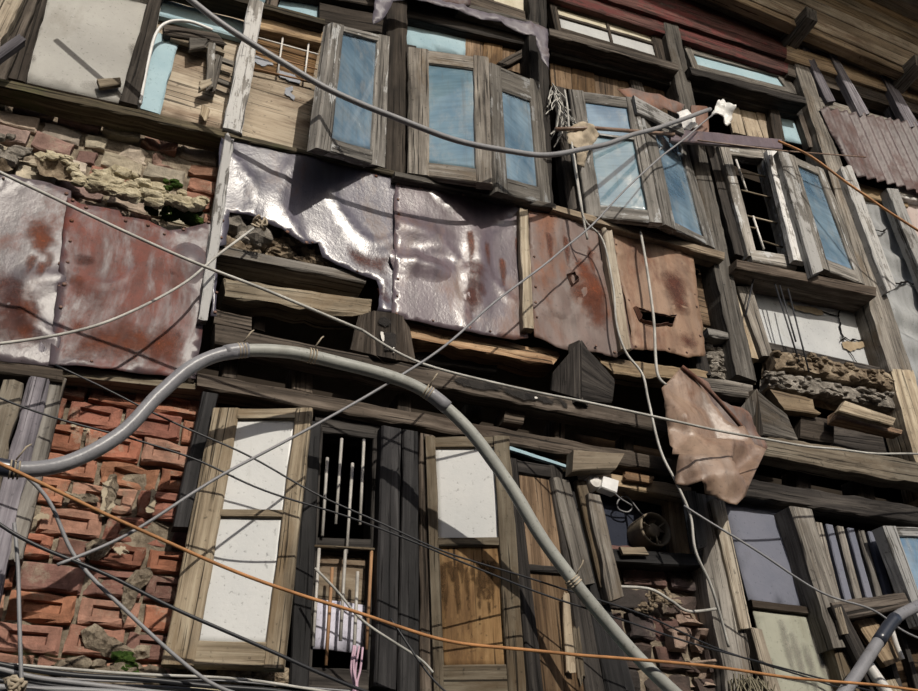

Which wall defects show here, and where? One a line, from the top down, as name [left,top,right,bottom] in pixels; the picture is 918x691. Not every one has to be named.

spalling [0,133,210,212]
corrosion [0,278,34,340]
corrosion [28,224,53,273]
corrosion [82,326,178,361]
corrosion [466,231,483,306]
corrosion [564,237,605,324]
corrosion [667,275,686,309]
crack [822,310,863,362]